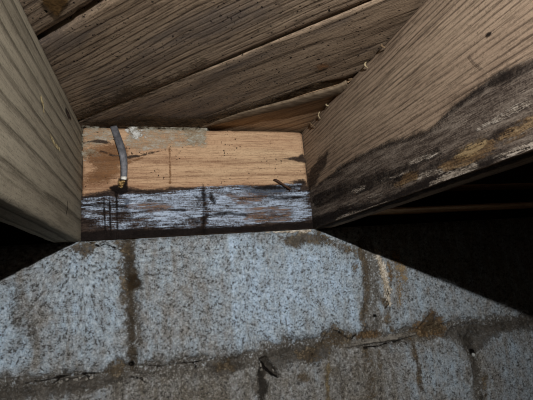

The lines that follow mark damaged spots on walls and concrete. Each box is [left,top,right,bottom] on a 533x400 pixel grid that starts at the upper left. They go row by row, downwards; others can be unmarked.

damp [69,58,533,372]
damp [207,352,248,376]
damp [263,344,337,400]
damp [404,339,423,390]
damp [445,314,533,400]